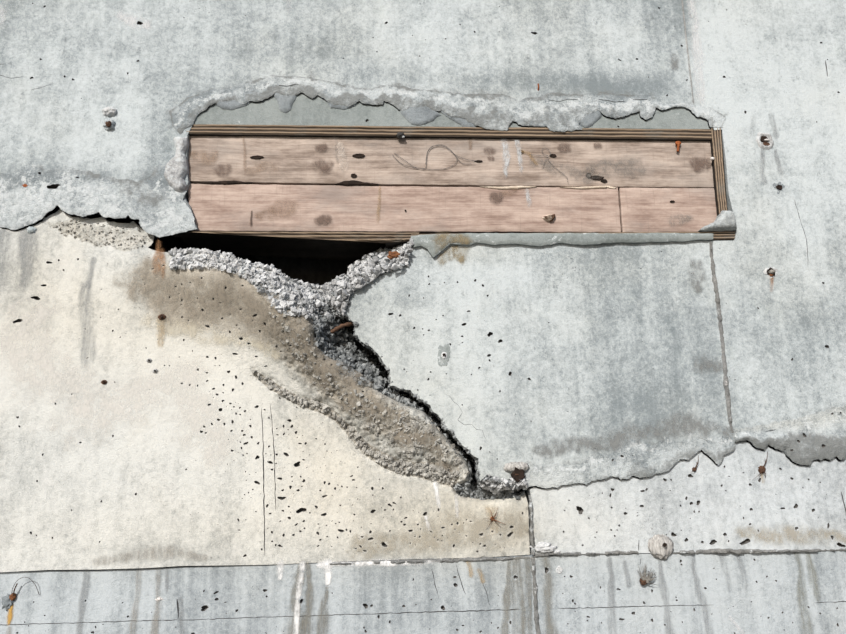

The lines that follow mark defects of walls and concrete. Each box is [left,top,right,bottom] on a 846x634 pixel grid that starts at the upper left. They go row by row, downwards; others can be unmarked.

peeling [164,75,726,193]
spalling [43,217,155,252]
leakage [128,259,448,469]
spalling [252,370,460,488]
crack [312,273,525,500]
spalling [473,472,528,495]
leakage [291,498,526,634]
leakage [502,557,531,634]
leakage [544,556,554,634]